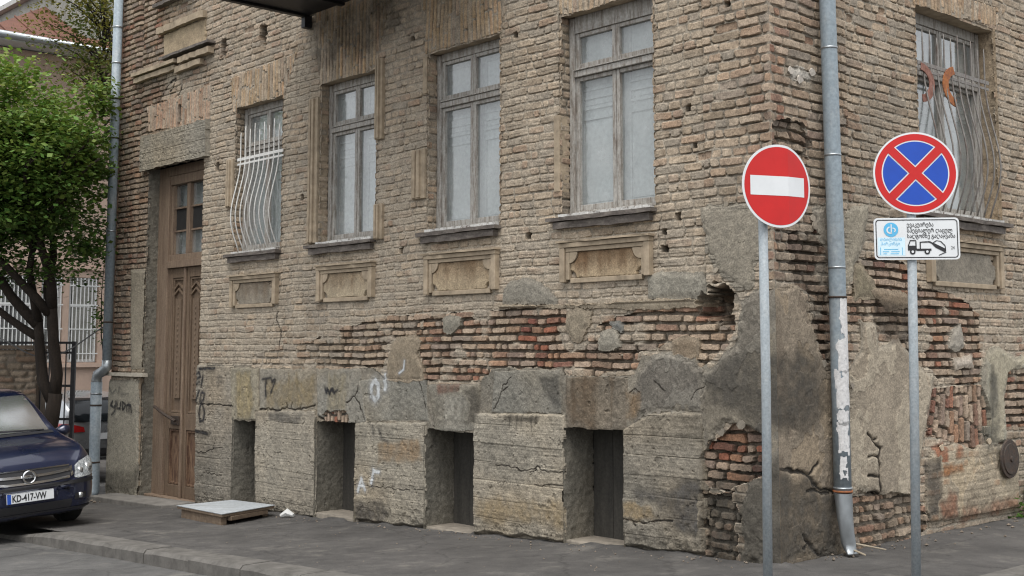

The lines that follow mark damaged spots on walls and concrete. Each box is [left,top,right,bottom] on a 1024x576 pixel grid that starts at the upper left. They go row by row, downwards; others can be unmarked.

spalling [772,118,812,160]
spalling [251,201,759,423]
flaking render [775,202,1024,564]
crack [498,465,566,487]
spalling [701,424,762,560]
crack [779,461,834,495]
crack [867,432,881,494]